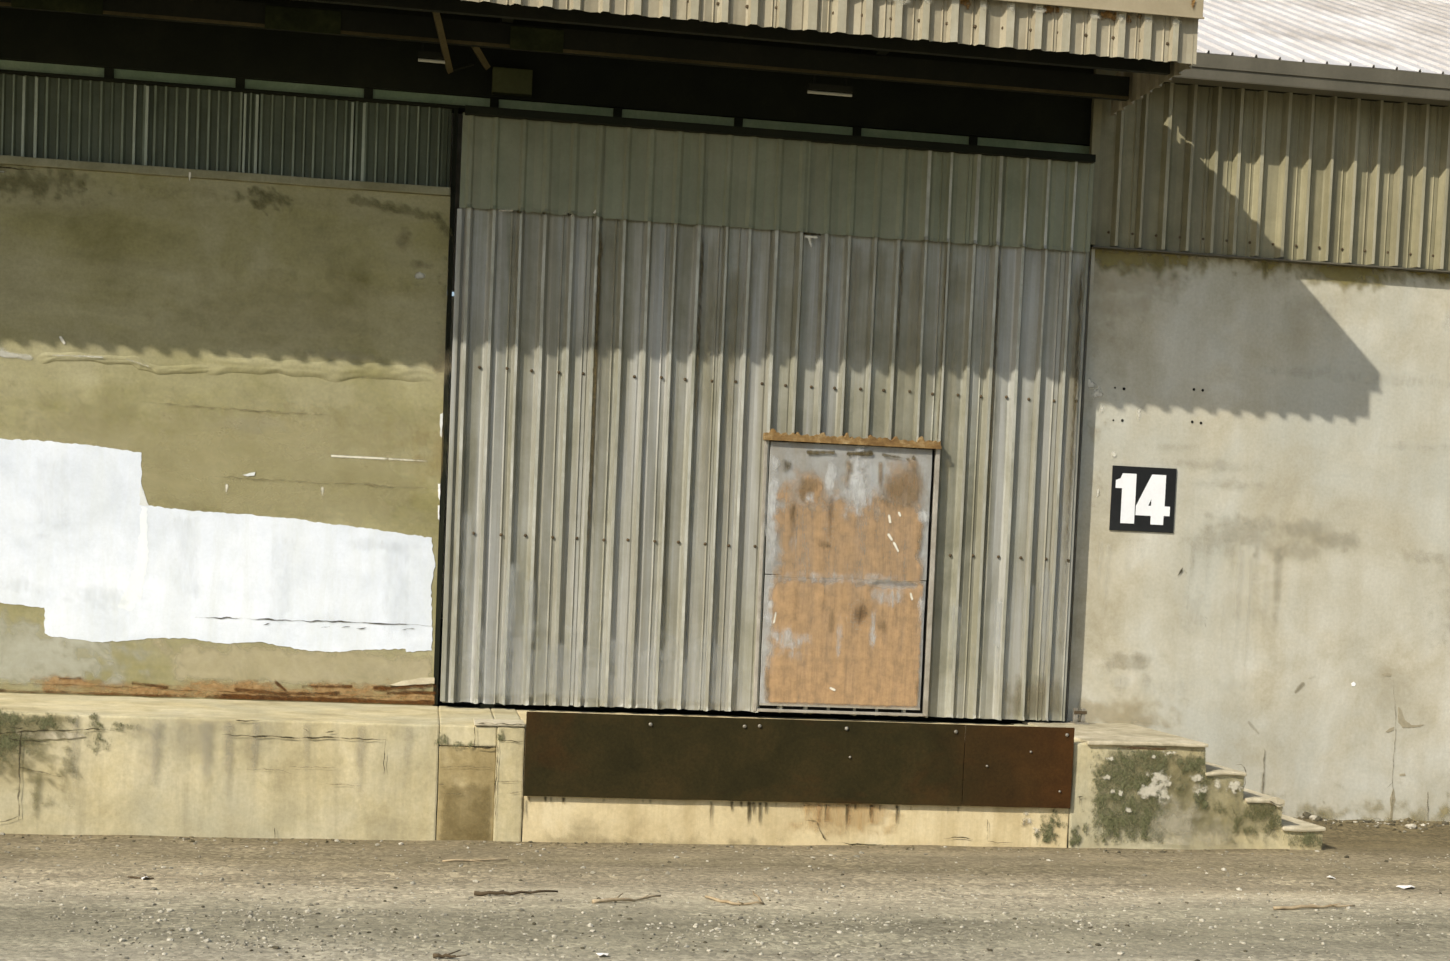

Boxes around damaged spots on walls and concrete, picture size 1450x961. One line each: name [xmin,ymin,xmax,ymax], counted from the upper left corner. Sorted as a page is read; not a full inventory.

damp [1225,258,1450,286]
damp [1069,245,1190,493]
corrosion [765,464,923,707]
corrosion [0,676,436,705]
damp [1193,788,1208,809]